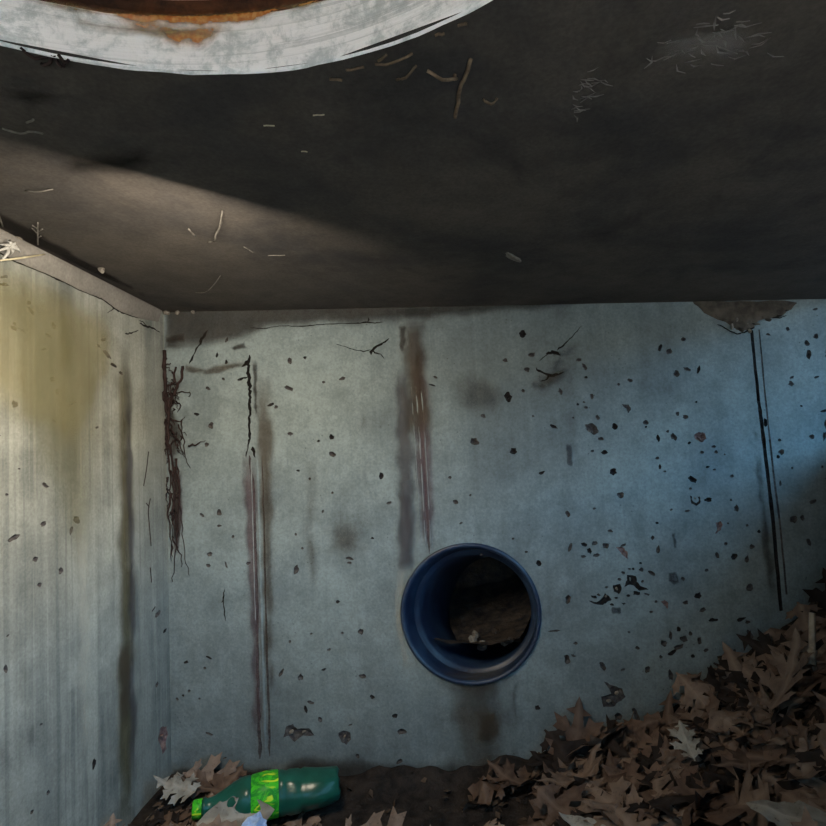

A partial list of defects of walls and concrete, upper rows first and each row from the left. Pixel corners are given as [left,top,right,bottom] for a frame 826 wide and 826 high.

corrosion [116,9,279,44]
crack [0,253,159,335]
crack [259,319,389,358]
peeling [693,300,797,335]
water stain [397,327,433,565]
water stain [245,366,271,720]